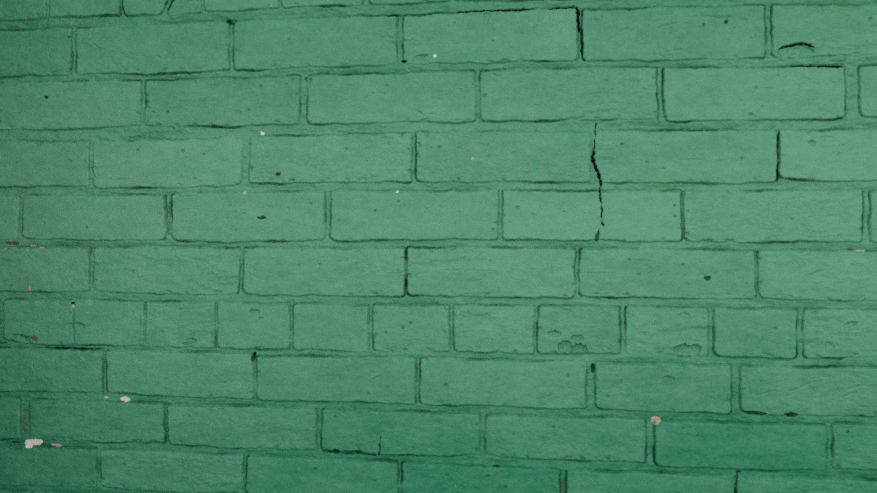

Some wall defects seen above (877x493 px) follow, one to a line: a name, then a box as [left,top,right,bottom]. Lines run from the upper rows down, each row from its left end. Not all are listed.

crack [591,123,604,242]
peeling [25,438,62,448]